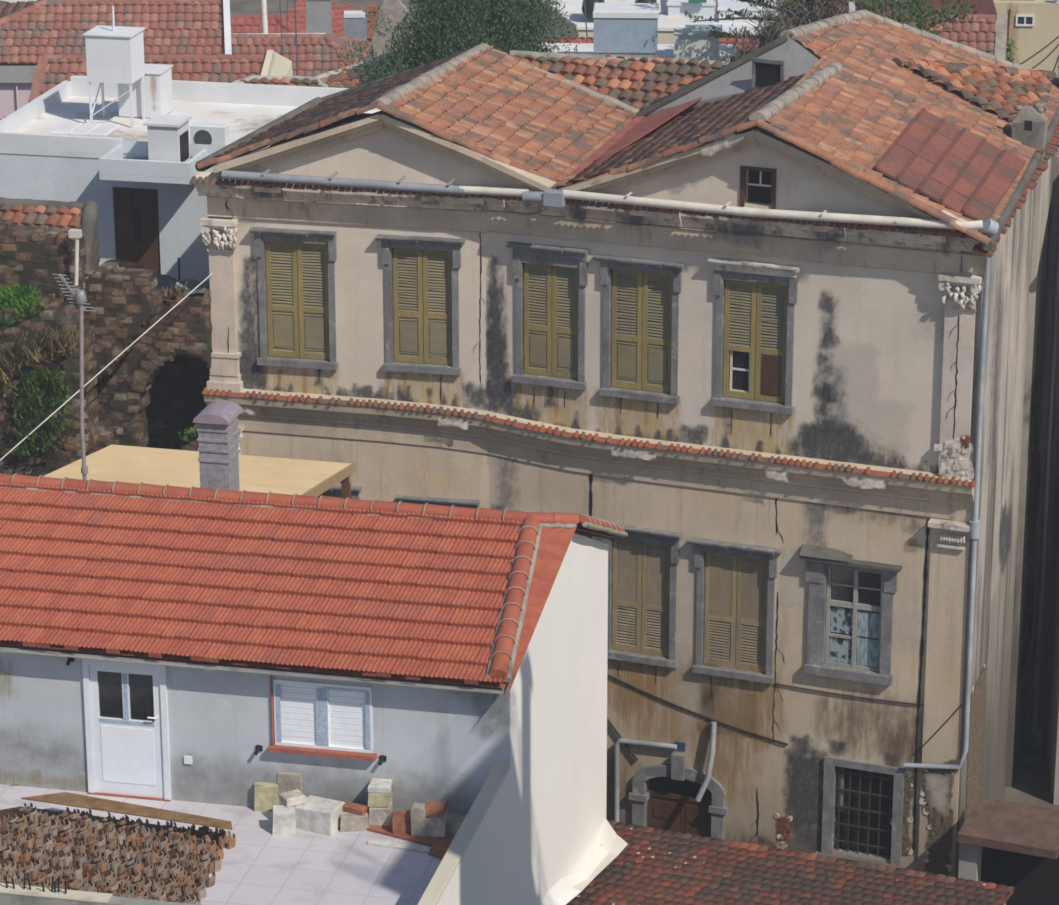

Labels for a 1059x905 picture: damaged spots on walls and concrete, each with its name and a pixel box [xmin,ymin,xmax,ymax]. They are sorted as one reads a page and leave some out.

leakage [239,258,267,390]
leakage [438,418,468,430]
leakage [486,258,515,416]
crack [586,474,594,539]
leakage [789,293,939,473]
leakage [843,478,886,489]
crack [946,313,959,439]
leakage [785,696,922,851]
flaking render [890,662,987,876]